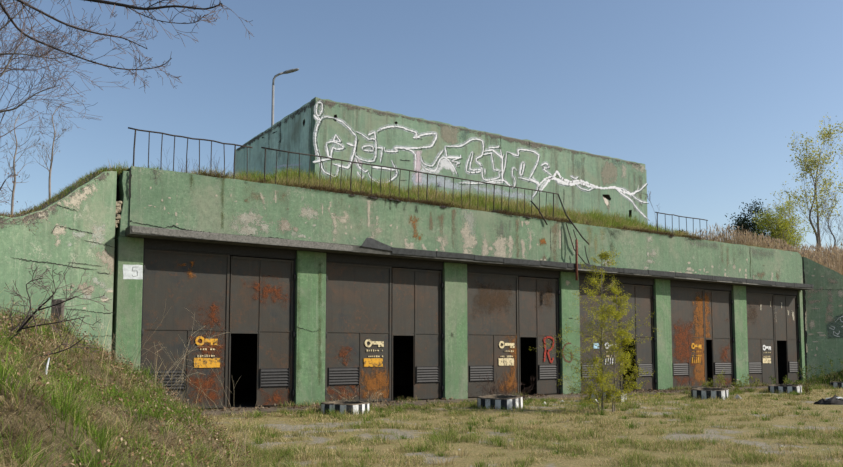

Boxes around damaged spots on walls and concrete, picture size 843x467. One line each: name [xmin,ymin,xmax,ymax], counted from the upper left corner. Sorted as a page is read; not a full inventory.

crack [126,170,134,199]
crack [51,205,118,248]
crack [130,221,204,232]
peeling [459,221,539,260]
crack [14,258,109,275]
rust [186,304,225,406]
rust [671,293,712,386]
rust [327,367,389,400]